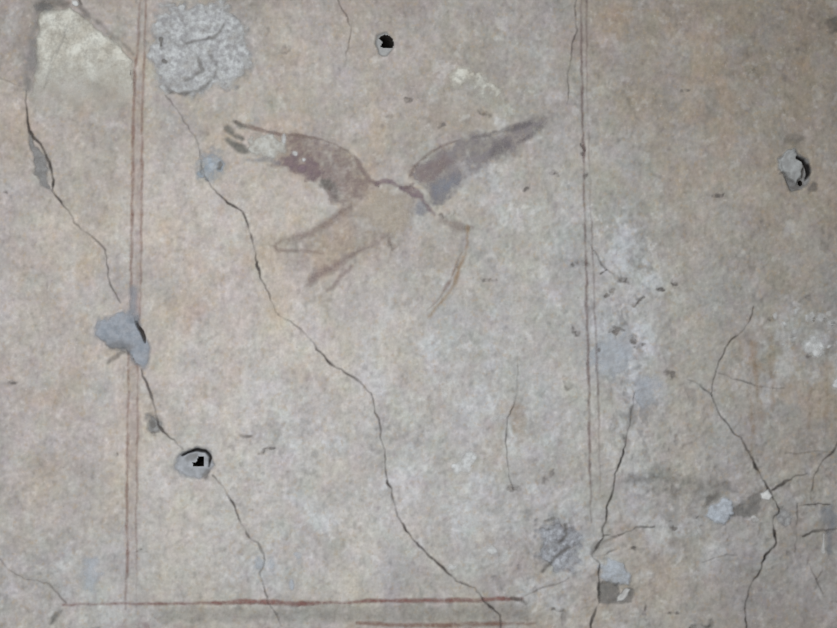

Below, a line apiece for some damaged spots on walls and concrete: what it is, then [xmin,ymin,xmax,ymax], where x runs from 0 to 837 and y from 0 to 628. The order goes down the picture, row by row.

spalling [35,0,133,92]
spalling [29,135,50,189]
crack [27,116,62,203]
crack [403,524,449,574]
spalling [539,519,583,572]
crack [753,461,784,578]
spalling [598,559,633,603]